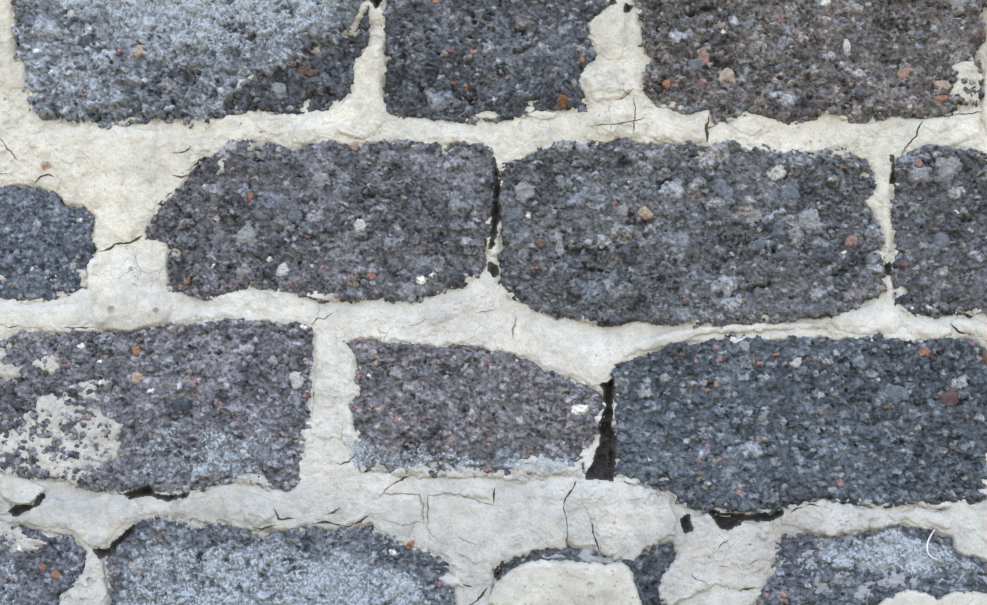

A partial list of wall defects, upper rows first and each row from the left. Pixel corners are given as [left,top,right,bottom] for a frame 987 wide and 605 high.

peeling [902,44,987,153]
crack [252,476,495,530]
crack [563,481,602,558]
crack [463,584,488,605]